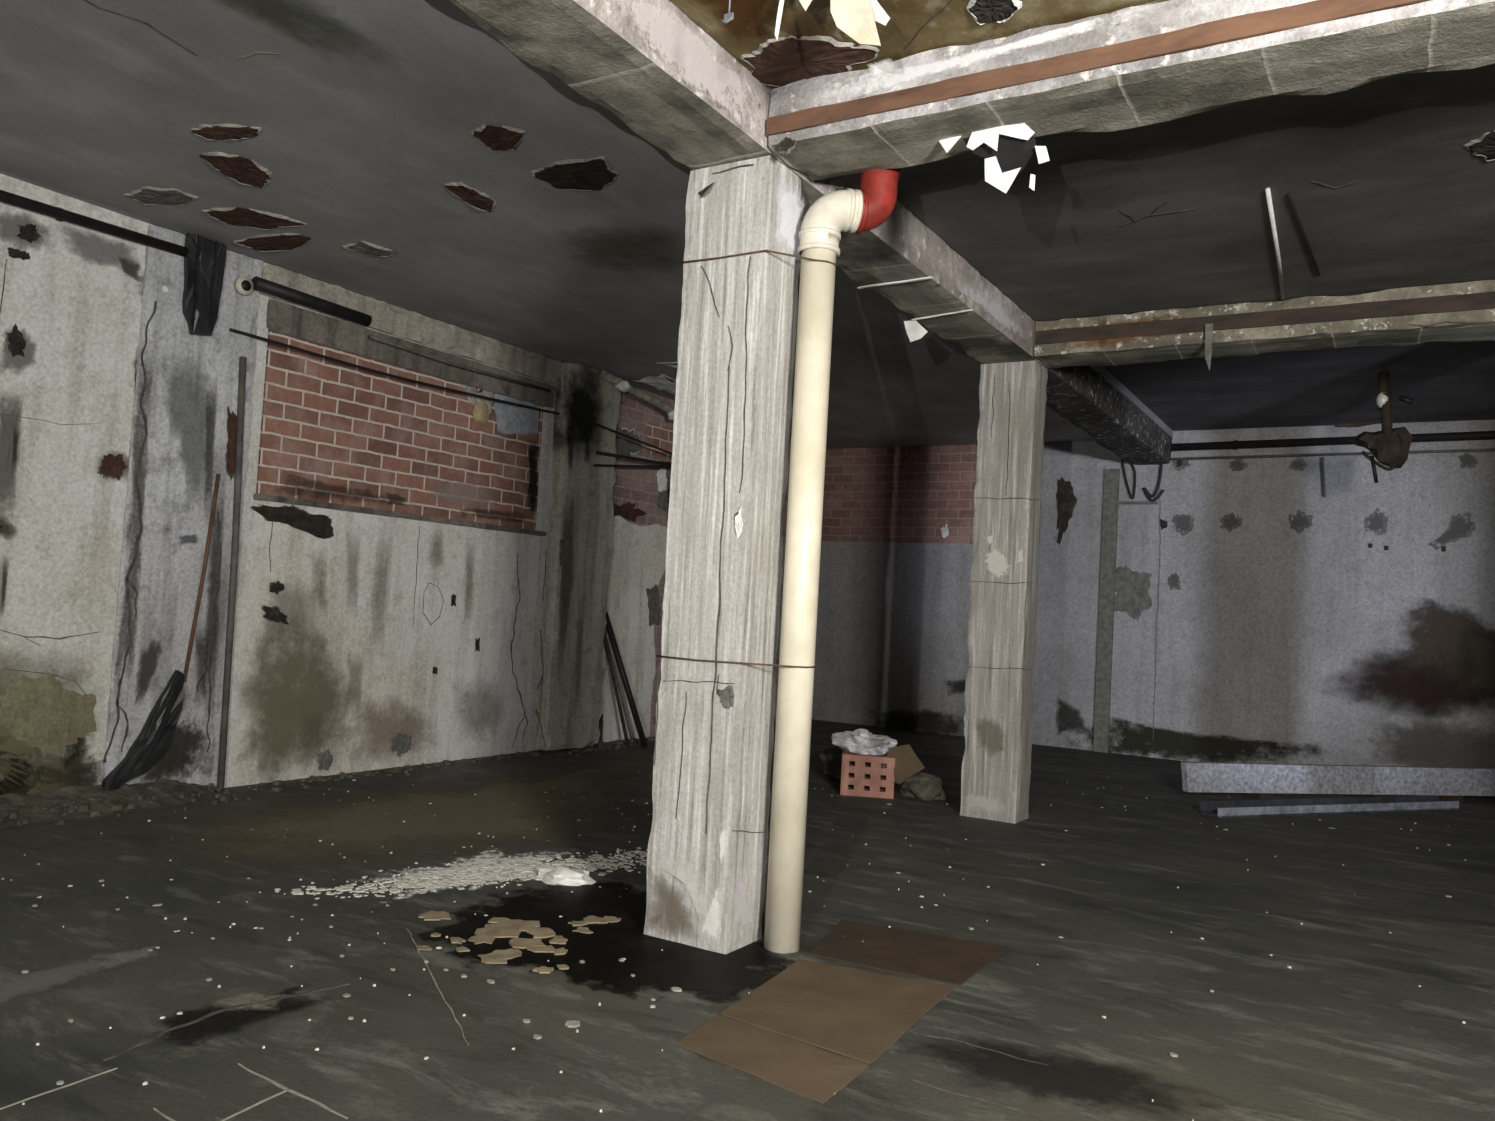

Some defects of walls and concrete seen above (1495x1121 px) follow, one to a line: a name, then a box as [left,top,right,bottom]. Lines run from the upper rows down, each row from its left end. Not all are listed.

spalling [191,124,273,189]
spalling [1463,131,1495,161]
spalling [123,186,311,252]
leakage [0,398,20,502]
crack [0,301,157,763]
flaking render [250,505,334,539]
spalling [613,502,647,522]
leakage [1343,601,1495,768]
leakage [0,726,99,795]
leakage [1057,700,1318,762]